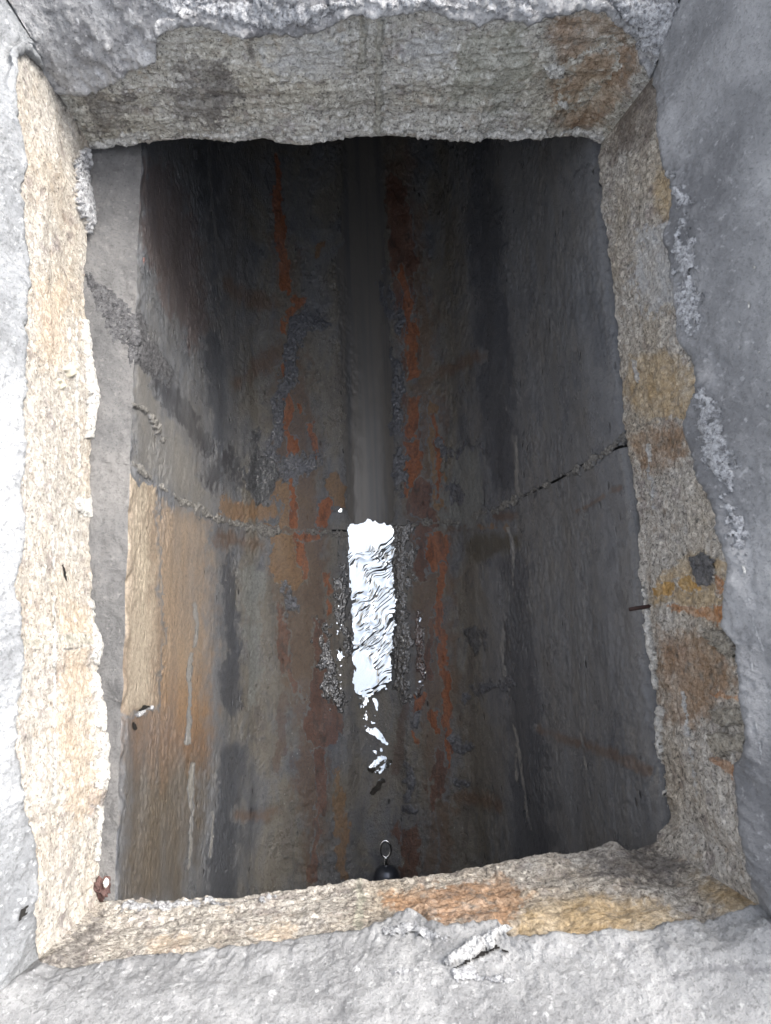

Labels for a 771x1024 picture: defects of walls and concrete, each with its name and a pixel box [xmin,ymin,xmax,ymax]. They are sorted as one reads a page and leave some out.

rust [256,151,312,343]
rust [380,135,448,375]
spalling [237,373,324,507]
rust [41,332,353,902]
spalling [310,555,356,714]
spalling [389,519,421,710]
rust [372,437,757,937]